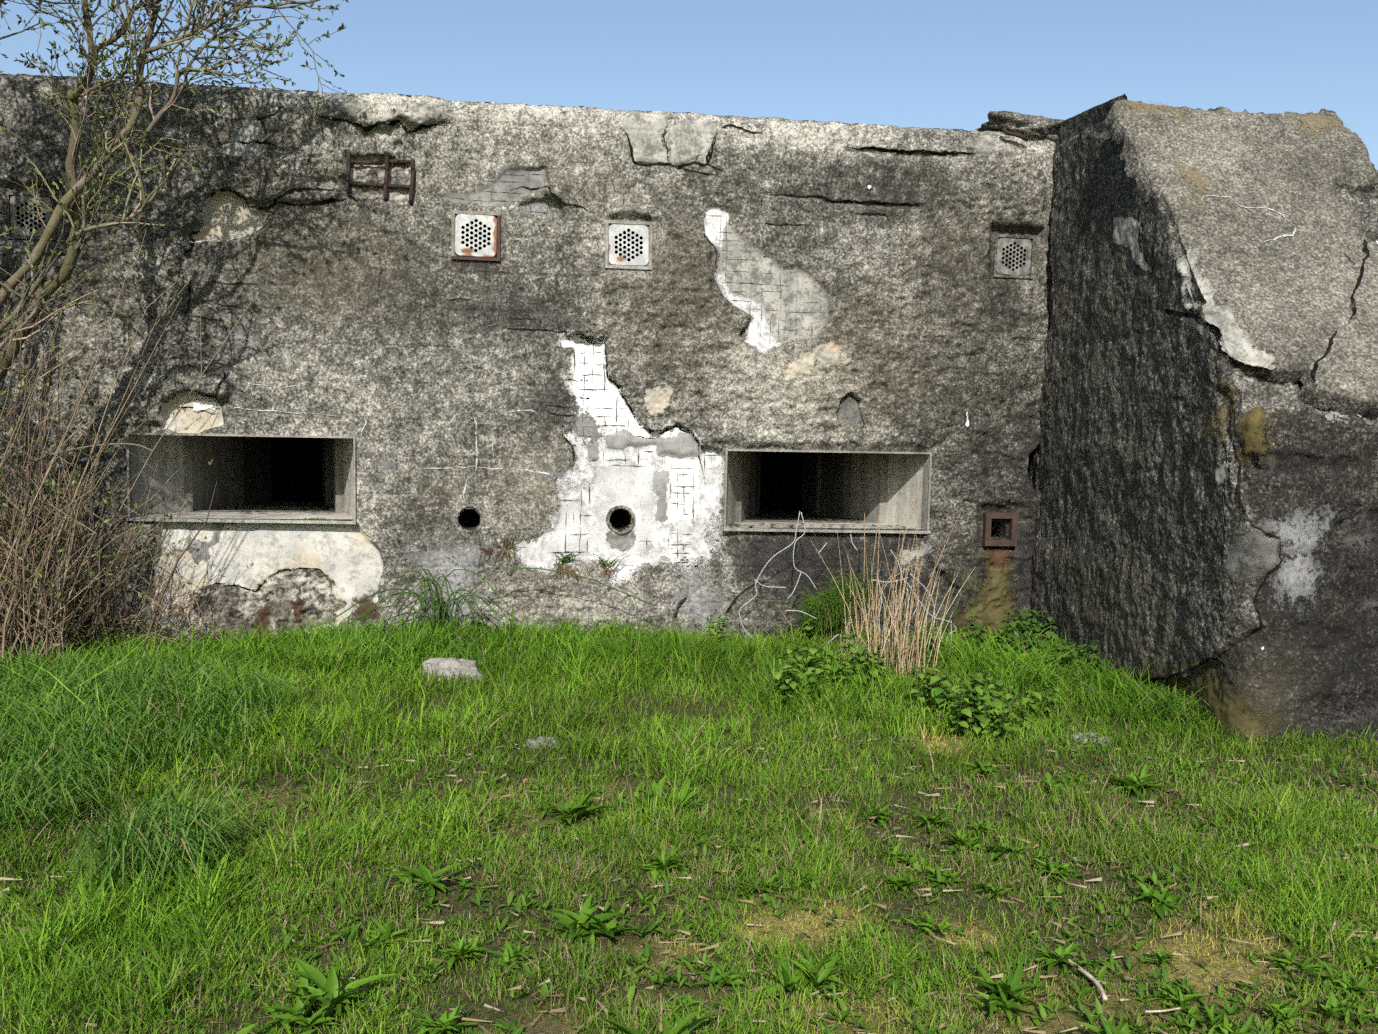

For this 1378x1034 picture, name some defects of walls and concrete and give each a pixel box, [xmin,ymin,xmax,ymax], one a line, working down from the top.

spalling [191,190,268,243]
peeling [703,207,833,355]
crack [761,193,932,226]
crack [845,146,973,156]
peeling [1113,216,1152,274]
spalling [1176,242,1276,370]
crack [1312,239,1370,385]
spalling [158,391,224,434]
peeling [510,329,726,586]
crack [1121,304,1282,683]
spalling [139,521,384,640]